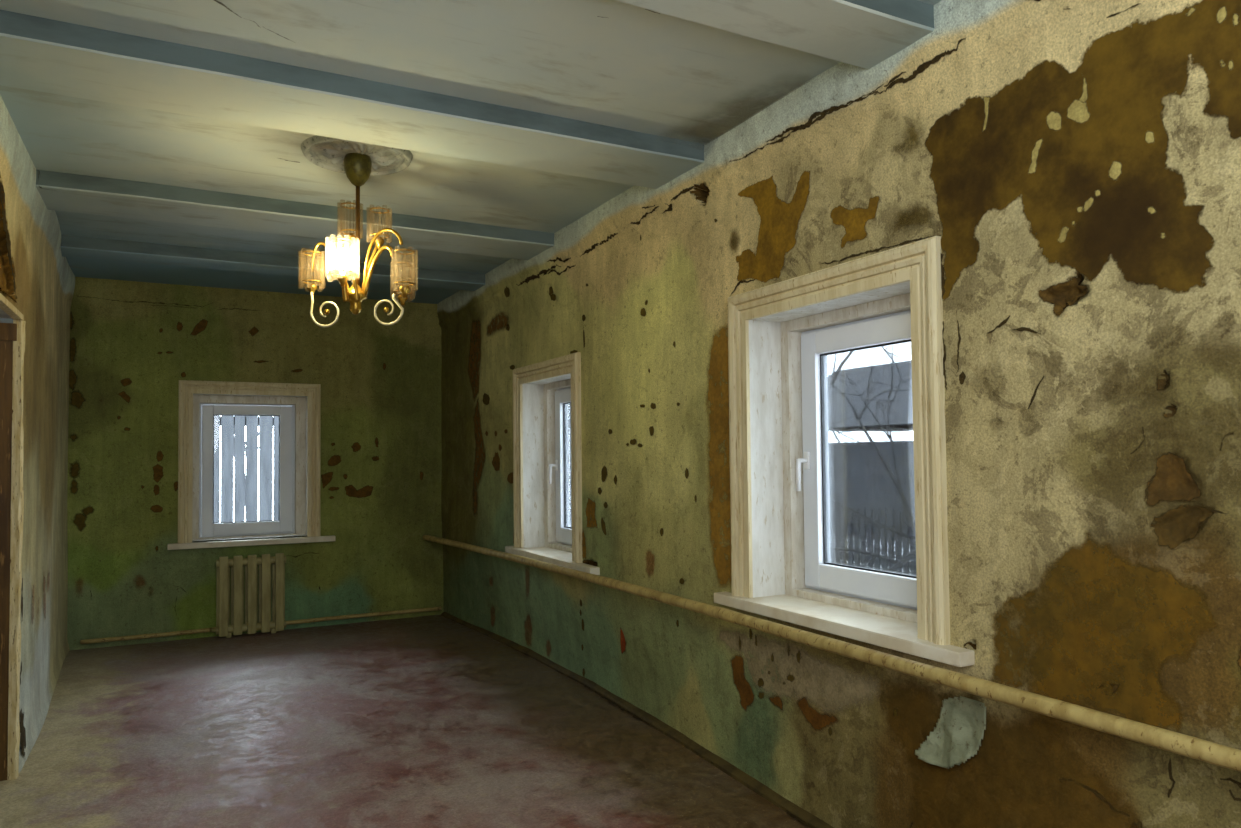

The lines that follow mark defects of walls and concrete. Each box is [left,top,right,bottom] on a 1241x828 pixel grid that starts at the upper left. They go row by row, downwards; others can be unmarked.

crack [729,38,966,162]
peeling [925,0,1241,316]
flaking render [0,174,17,303]
crack [516,186,695,286]
peeling [736,171,810,283]
peeling [830,196,880,248]
peeling [141,451,178,513]
peeling [694,327,731,586]
flaking render [720,629,877,711]
peeling [992,533,1216,730]
peeling [915,696,986,769]